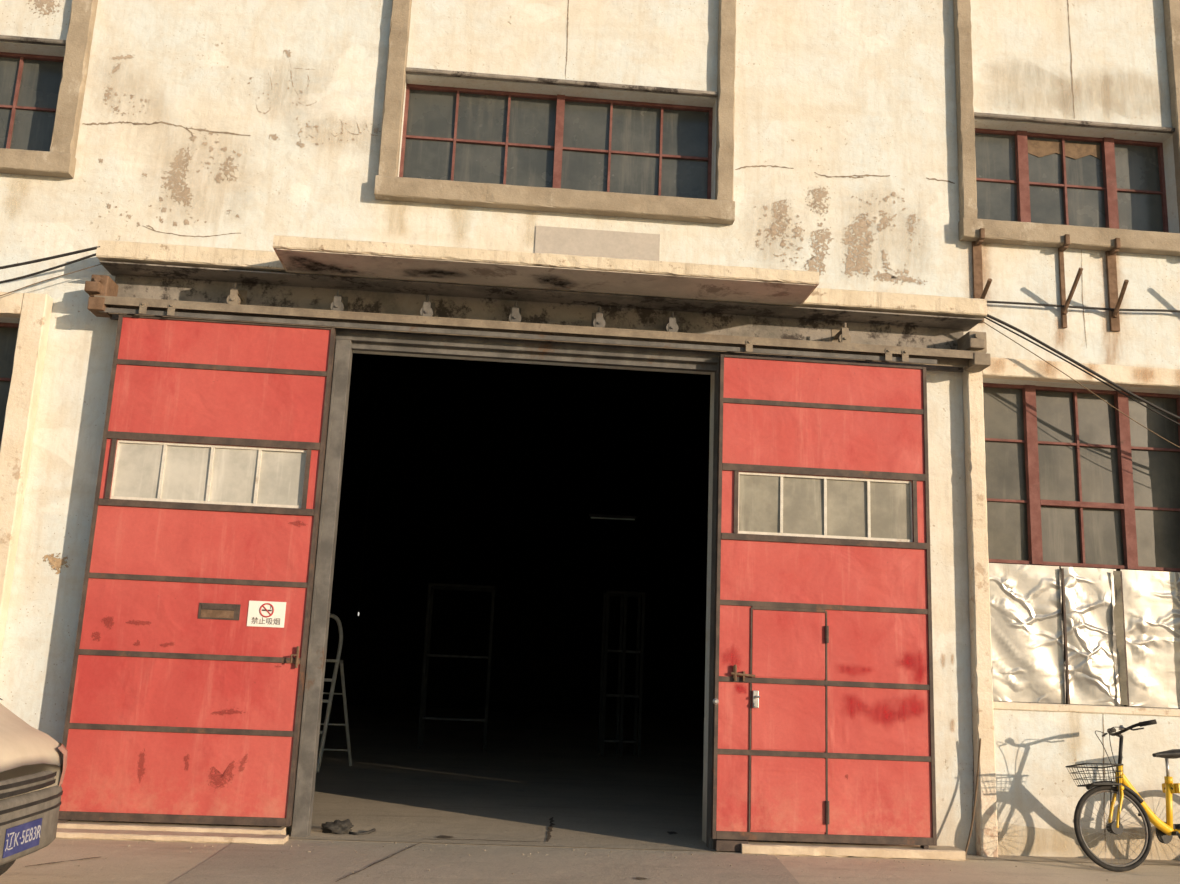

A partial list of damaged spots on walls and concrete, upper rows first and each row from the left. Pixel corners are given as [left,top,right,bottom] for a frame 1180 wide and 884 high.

peeling [28,0,64,19]
crack [1067,0,1075,118]
crack [83,121,250,136]
peeling [149,127,241,226]
crack [735,165,890,178]
peeling [754,186,925,285]
spalling [43,553,68,574]